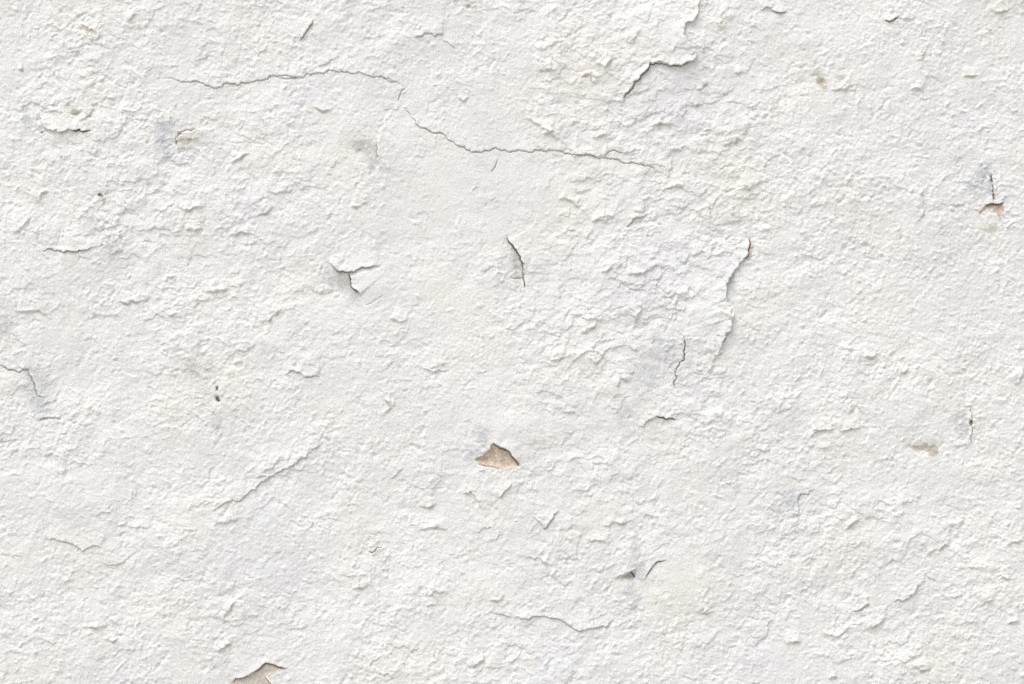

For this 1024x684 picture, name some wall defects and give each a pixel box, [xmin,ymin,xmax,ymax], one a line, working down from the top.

peeling [620,0,700,105]
spalling [979,176,1004,220]
spalling [475,439,521,470]
spalling [231,656,288,684]